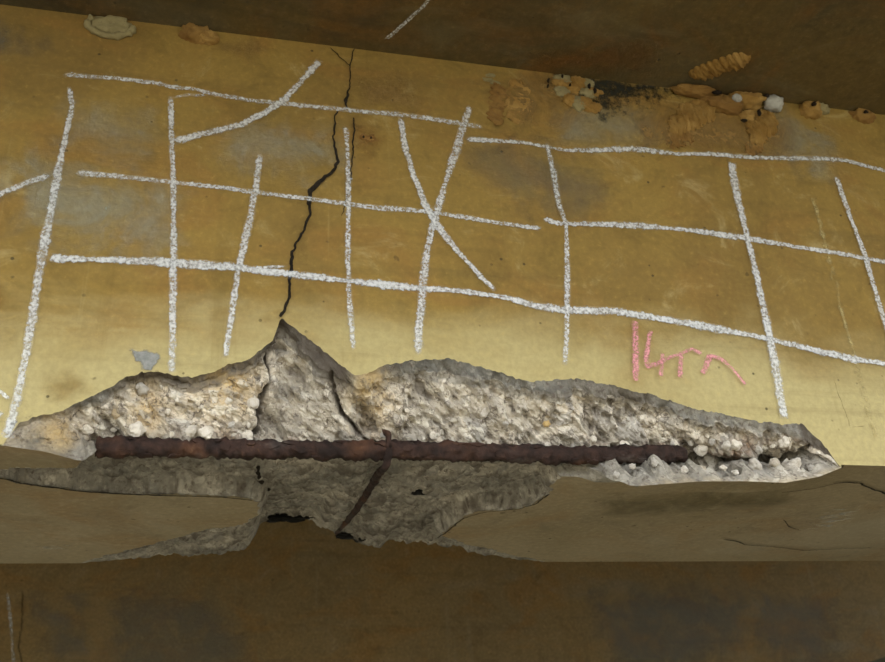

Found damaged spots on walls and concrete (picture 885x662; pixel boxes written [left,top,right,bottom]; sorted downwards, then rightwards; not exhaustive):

crack [279,48,356,317]
spalling [0,319,841,563]